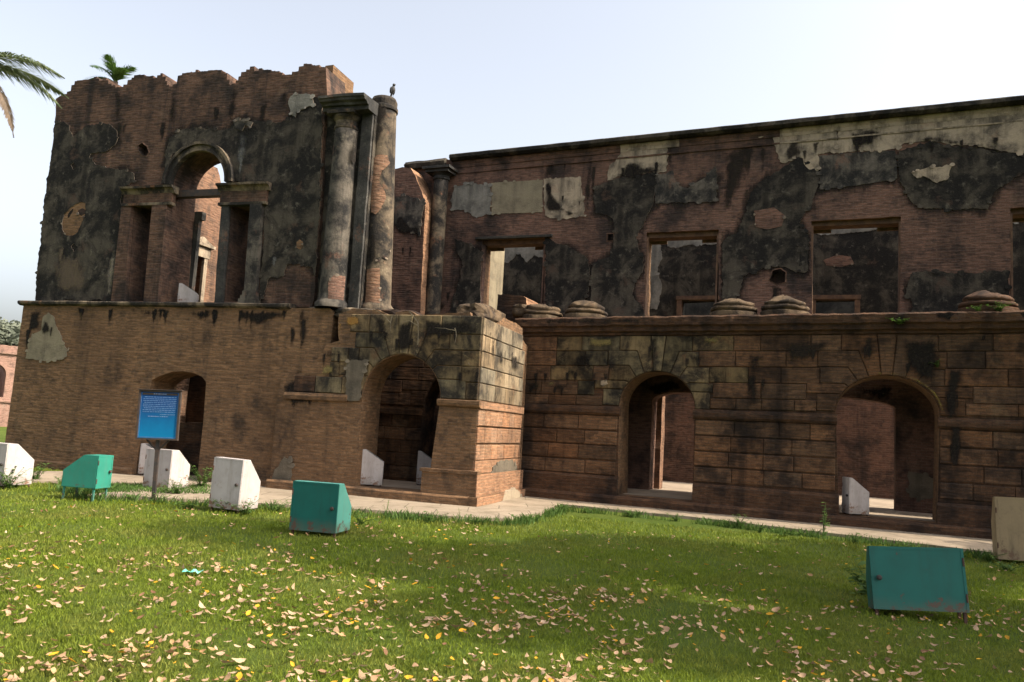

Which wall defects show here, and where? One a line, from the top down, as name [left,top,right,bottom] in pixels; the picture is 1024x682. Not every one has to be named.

leakage [852,130,878,153]
leakage [618,151,671,179]
flaking render [161,92,324,303]
flaking render [371,154,426,238]
flaking render [450,114,1024,316]
flaking render [25,120,137,363]
leakage [26,312,52,345]
leakage [238,310,306,345]
leakage [369,318,413,350]
leakage [425,320,476,341]
leakage [489,332,519,373]
leakage [879,341,961,465]